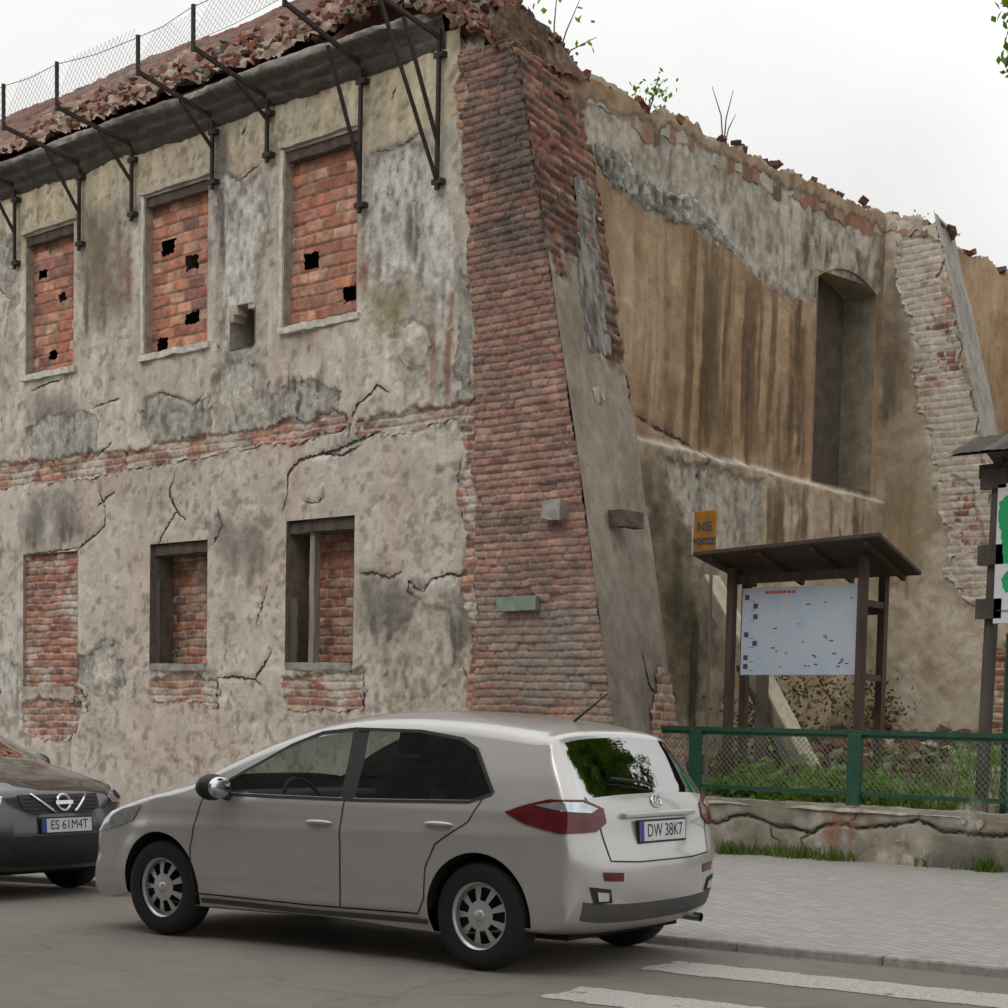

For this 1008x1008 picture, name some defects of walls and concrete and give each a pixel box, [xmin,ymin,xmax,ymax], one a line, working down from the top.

flaking render [452,71,469,192]
damp [805,213,832,264]
spalling [0,137,482,714]
crack [282,383,387,512]
damp [619,227,664,423]
damp [685,261,776,464]
spalling [574,98,991,605]
damp [789,296,805,454]
crack [359,571,466,600]
flaking render [0,636,126,743]
crack [217,652,272,687]
crack [712,813,1008,848]